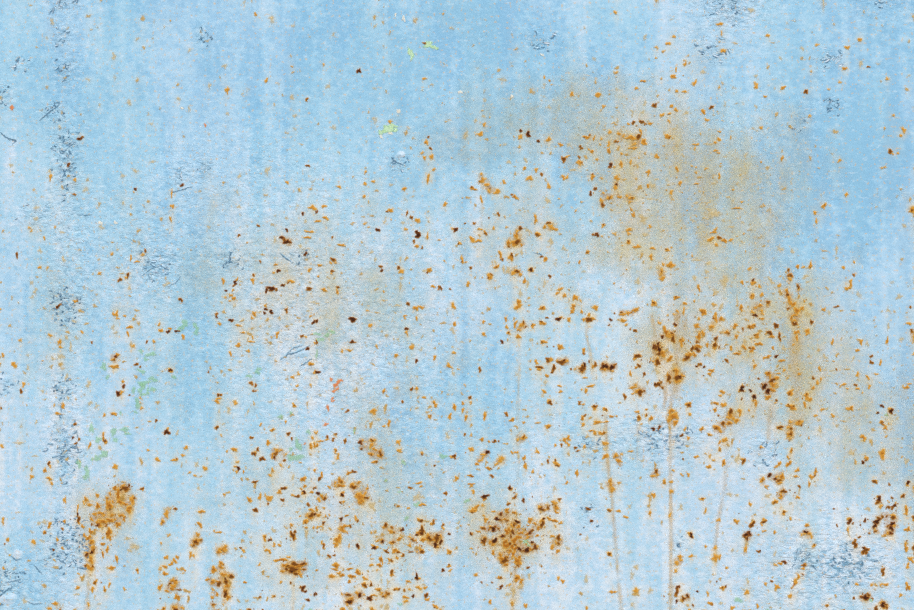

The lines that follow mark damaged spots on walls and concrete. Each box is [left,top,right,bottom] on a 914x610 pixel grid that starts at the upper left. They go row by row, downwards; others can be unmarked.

corrosion [30,266,97,380]
corrosion [26,432,107,485]
corrosion [140,445,207,489]
corrosion [31,458,144,607]